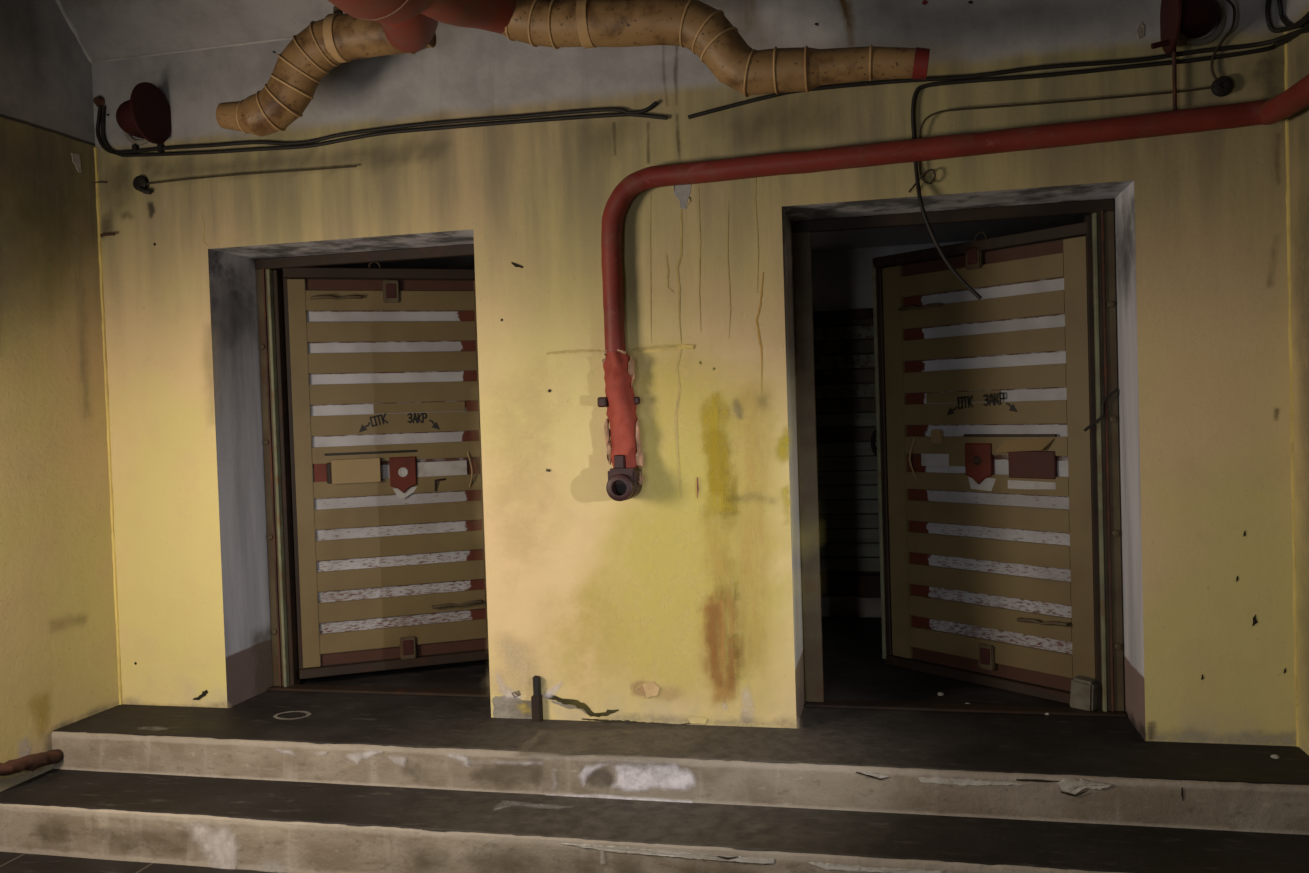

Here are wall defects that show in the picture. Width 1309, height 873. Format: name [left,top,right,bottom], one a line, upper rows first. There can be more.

water stain [618,374,760,673]
corrosion [704,591,739,699]
crack [546,694,692,725]